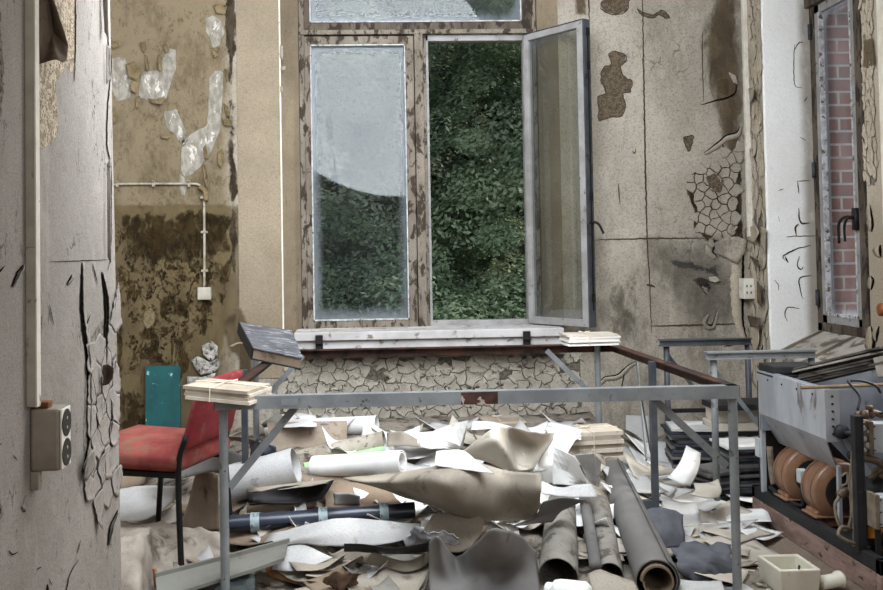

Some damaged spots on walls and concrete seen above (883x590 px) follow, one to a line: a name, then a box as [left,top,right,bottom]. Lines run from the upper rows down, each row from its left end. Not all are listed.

peeling [600,0,670,19]
peeling [39,0,77,150]
peeling [597,51,633,121]
damp [704,0,742,163]
crack [51,38,114,471]
crack [685,126,747,347]
damp [114,205,251,431]
crack [276,352,639,419]
crack [0,495,28,521]
crack [108,509,120,545]
crack [37,540,81,590]